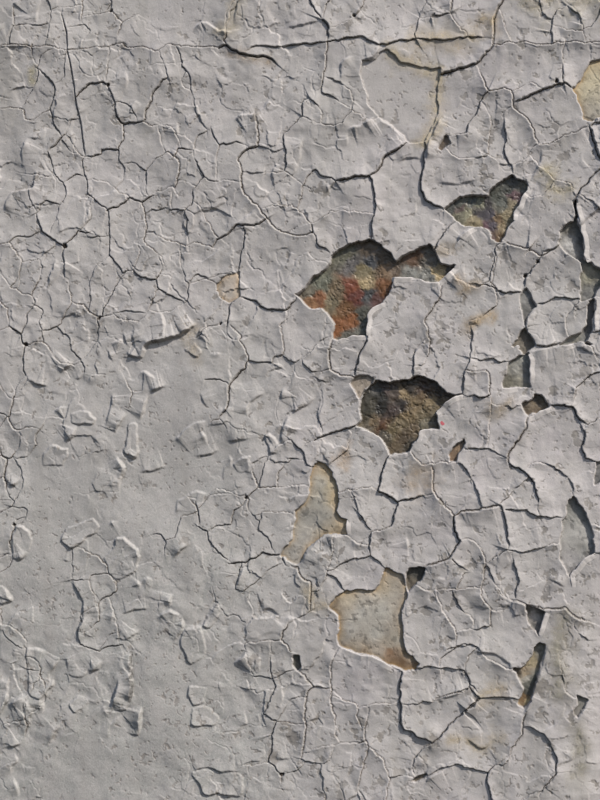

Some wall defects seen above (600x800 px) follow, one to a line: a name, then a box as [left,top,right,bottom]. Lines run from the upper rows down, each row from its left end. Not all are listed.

peeling [573,60,600,125]
crack [0,0,600,373]
peeling [445,176,532,250]
crack [196,298,367,423]
peeling [298,240,459,345]
peeling [356,376,467,460]
crack [463,241,559,416]
crack [0,450,27,572]
crack [167,421,355,592]
peeling [281,462,352,564]
peeling [329,568,419,672]
crack [244,420,563,799]